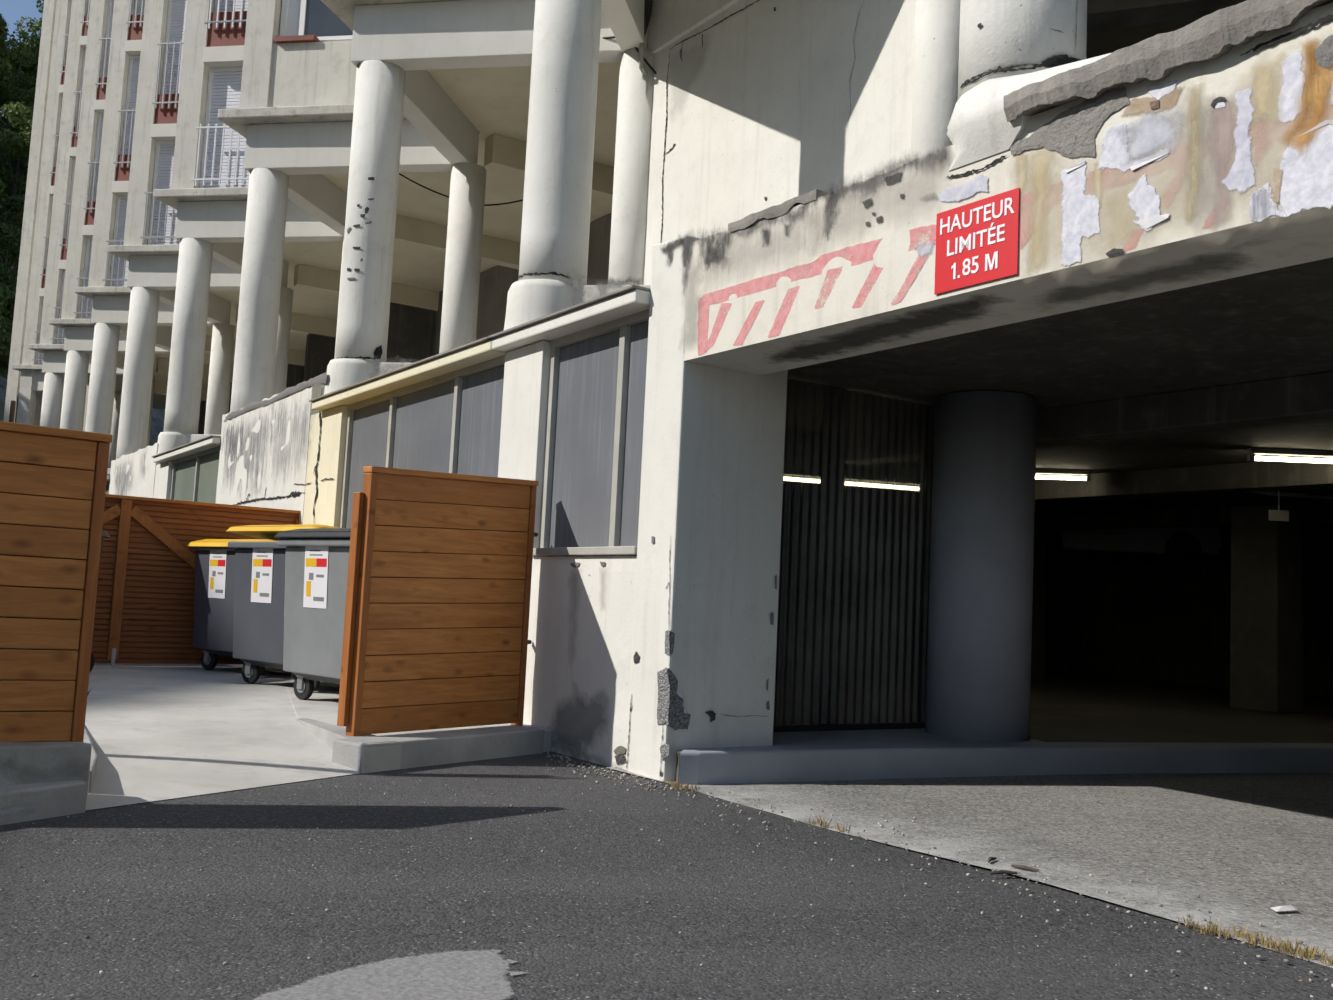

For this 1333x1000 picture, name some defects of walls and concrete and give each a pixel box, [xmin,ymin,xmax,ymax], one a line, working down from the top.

spalling [347,198,374,280]
damp [572,277,640,300]
damp [662,206,805,278]
damp [820,145,947,237]
peeling [925,174,988,202]
spalling [1010,80,1182,266]
peeling [1211,35,1333,222]
rust [1285,43,1333,148]
crack [233,392,333,516]
spalling [657,630,716,776]